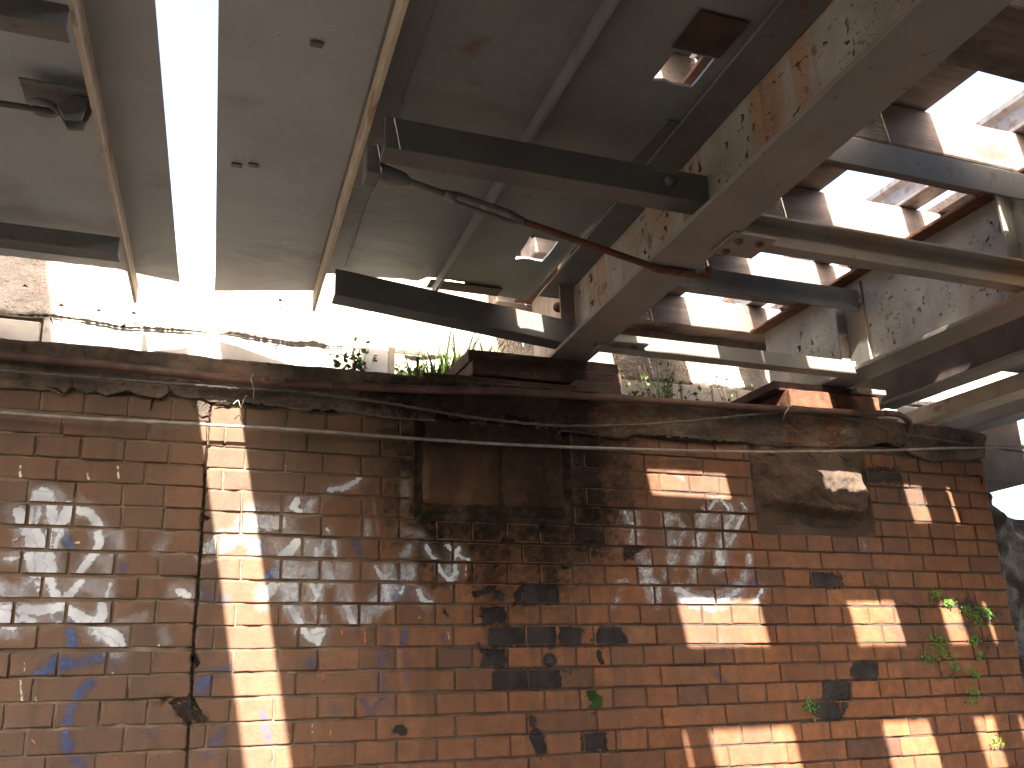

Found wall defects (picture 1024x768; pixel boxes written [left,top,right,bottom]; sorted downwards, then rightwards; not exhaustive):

spalling [191,400,210,417]
leakage [572,400,603,554]
crack [48,380,338,766]